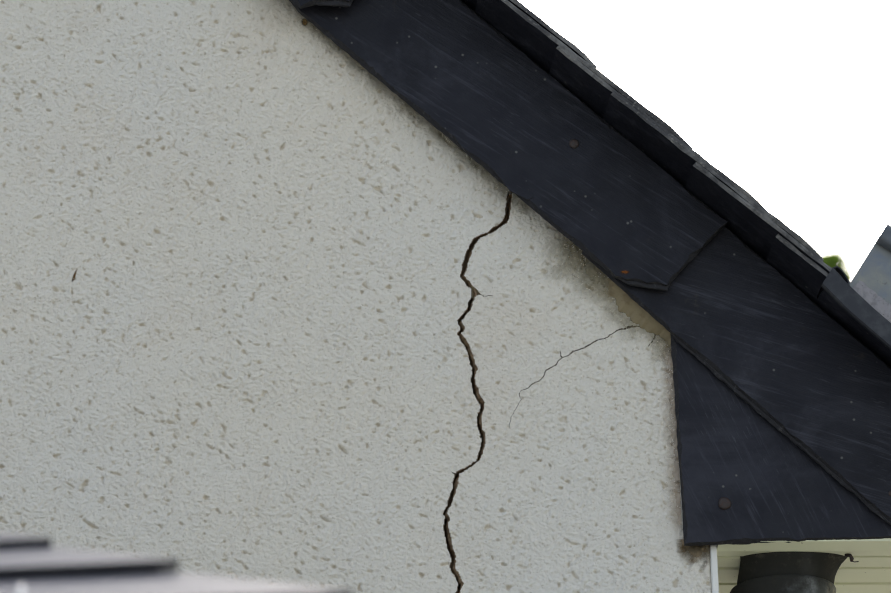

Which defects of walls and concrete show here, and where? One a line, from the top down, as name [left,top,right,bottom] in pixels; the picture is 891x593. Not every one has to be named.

crack [443,191,512,593]
crack [509,325,656,427]